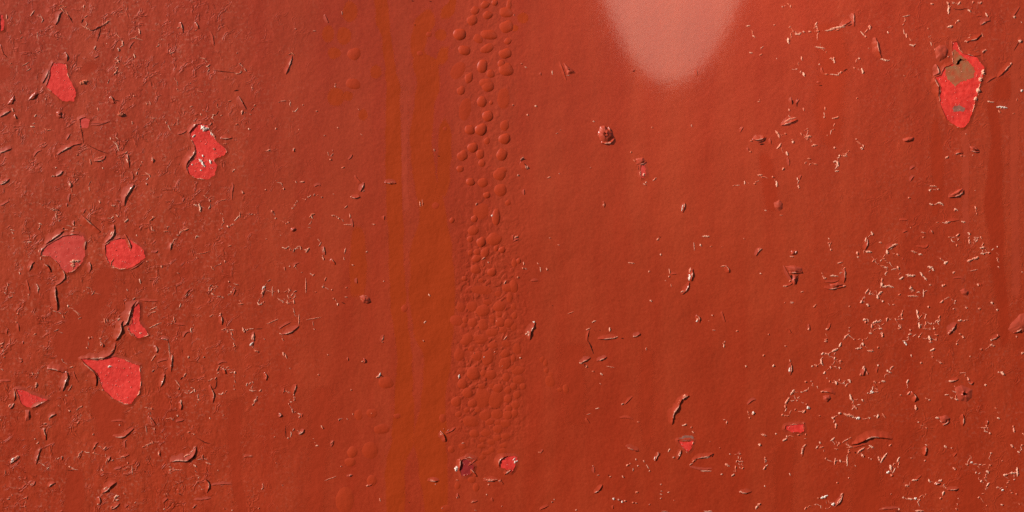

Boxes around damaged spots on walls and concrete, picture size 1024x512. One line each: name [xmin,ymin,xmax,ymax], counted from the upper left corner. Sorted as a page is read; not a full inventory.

spalling [41,52,93,155]
spalling [930,1,1011,131]
spalling [177,120,232,182]
spalling [26,220,91,311]
spalling [102,219,172,272]
peeling [860,230,948,337]
spalling [0,379,56,465]
spalling [78,298,173,510]
spalling [454,453,520,481]
spalling [667,394,713,472]
peeling [820,335,892,420]
peeling [834,414,900,474]